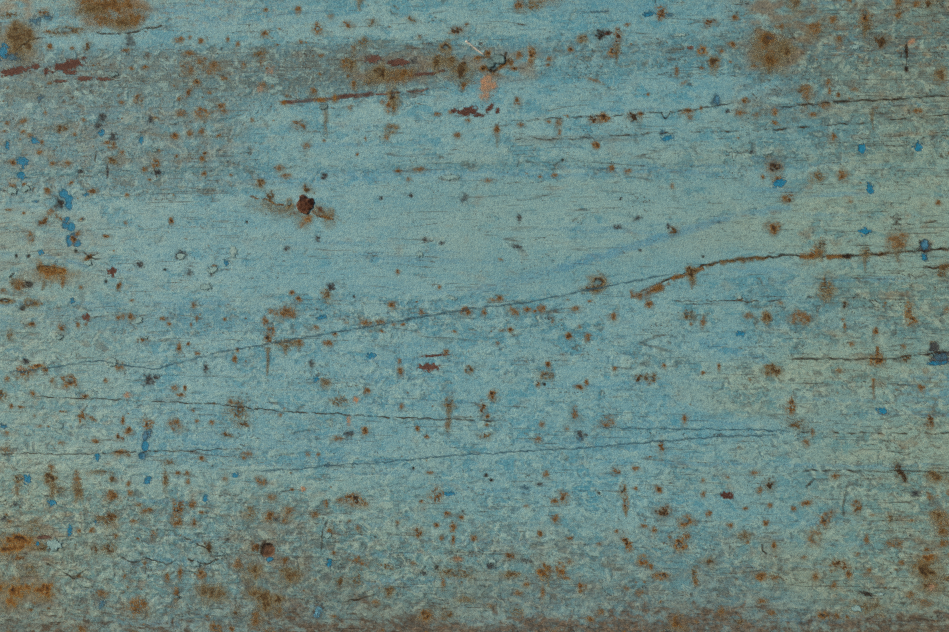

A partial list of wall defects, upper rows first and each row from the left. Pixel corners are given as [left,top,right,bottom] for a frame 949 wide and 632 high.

corrosion [1,12,89,57]
corrosion [76,0,144,28]
corrosion [340,19,412,140]
corrosion [432,23,552,90]
corrosion [251,178,334,227]
crack [630,247,949,301]
corrosion [460,296,554,332]
corrosion [480,390,495,438]
corrosion [312,493,367,517]
corrosion [0,514,54,611]
corrosion [504,561,586,596]
corrosion [615,530,668,594]